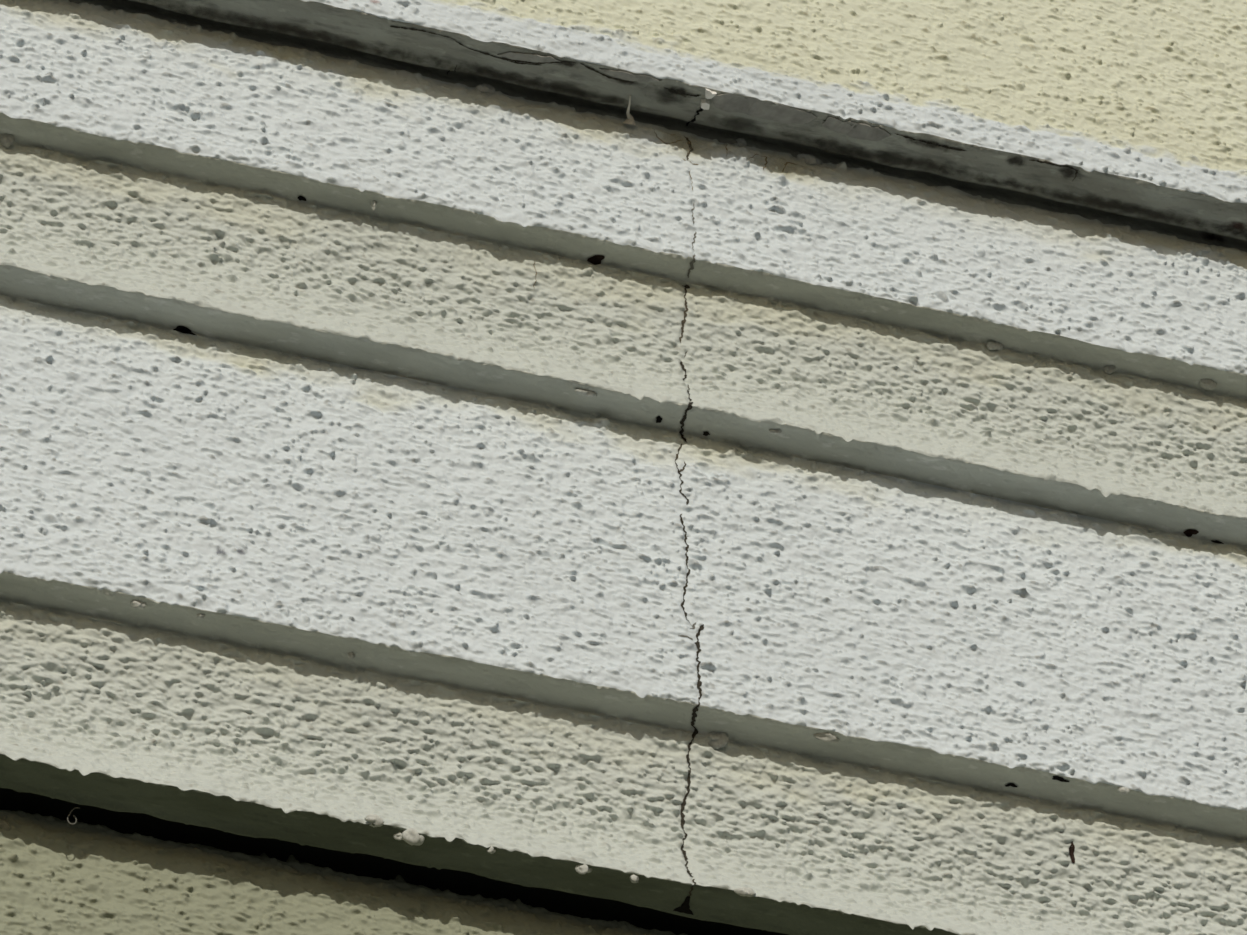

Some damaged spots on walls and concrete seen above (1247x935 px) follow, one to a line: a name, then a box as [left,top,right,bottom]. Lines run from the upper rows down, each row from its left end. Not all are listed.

crack [390,26,617,80]
crack [654,79,804,915]